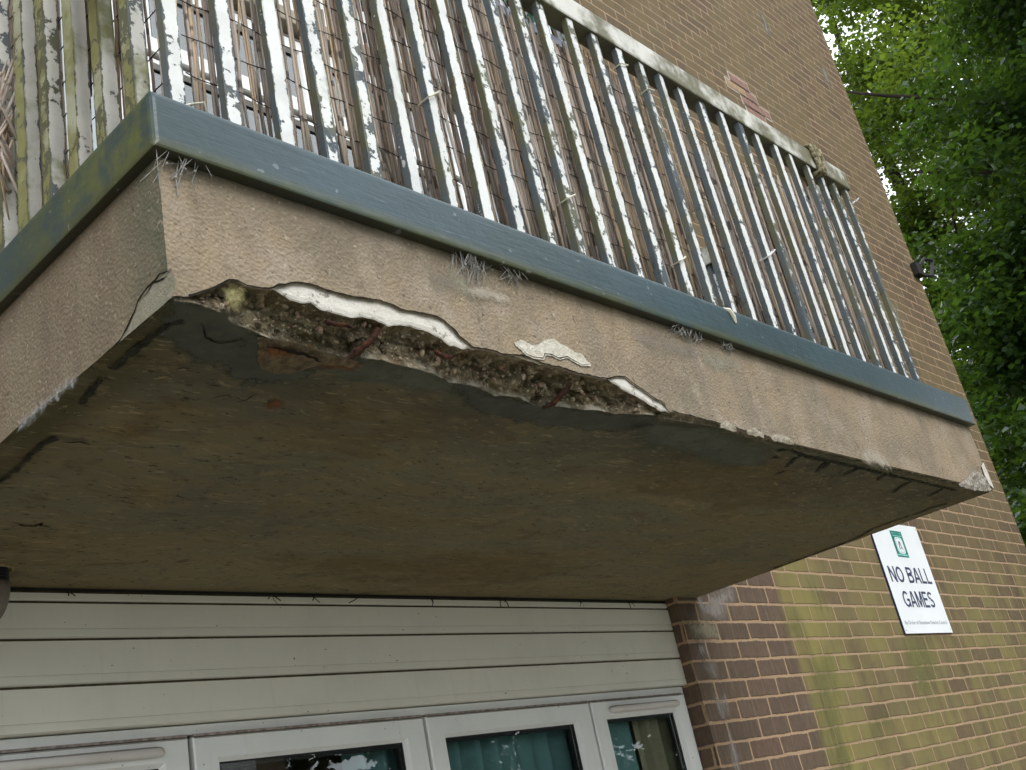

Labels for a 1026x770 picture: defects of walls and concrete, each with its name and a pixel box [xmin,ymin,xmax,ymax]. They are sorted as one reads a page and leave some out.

spalling [114,270,994,492]